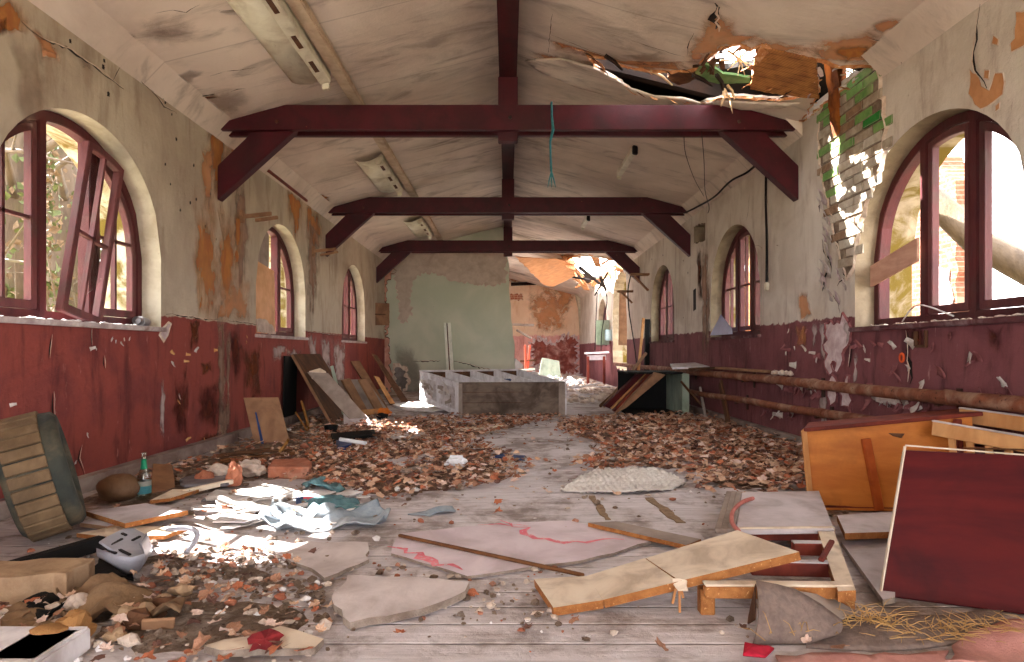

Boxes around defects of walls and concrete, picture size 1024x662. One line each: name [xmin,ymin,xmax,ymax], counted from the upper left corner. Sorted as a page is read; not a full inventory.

crack [21,21,176,113]
spalling [586,43,770,76]
crack [971,7,987,89]
peeling [991,10,1024,53]
peeling [968,69,1006,112]
flaking render [776,58,931,414]
peeling [384,253,524,404]
peeling [527,331,580,375]
peeling [996,376,1013,395]